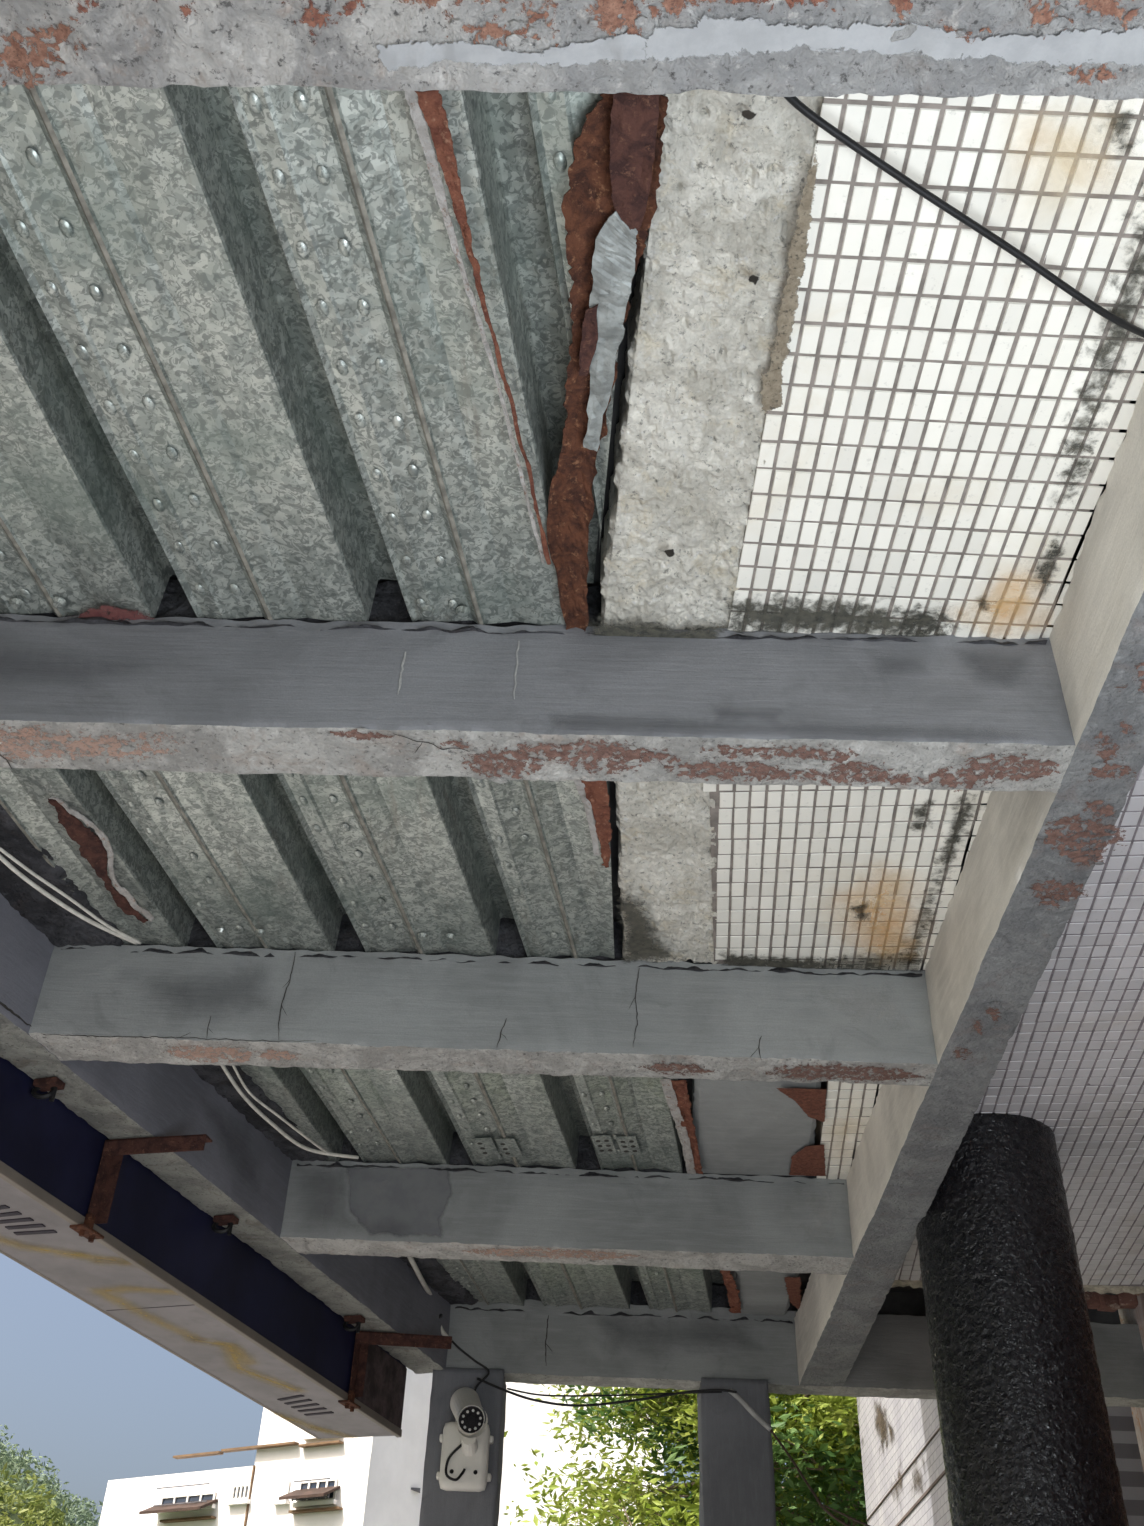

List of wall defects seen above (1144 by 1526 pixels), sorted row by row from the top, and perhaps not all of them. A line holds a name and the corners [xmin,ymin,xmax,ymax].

corrosion [0,0,99,91]
corrosion [270,0,366,46]
corrosion [399,0,560,49]
corrosion [586,0,857,37]
corrosion [405,90,669,632]
damp [1056,228,1144,503]
damp [979,596,1010,611]
damp [1035,540,1064,593]
corrosion [48,797,154,923]
corrosion [438,736,1064,868]
damp [721,795,975,972]
corrosion [1022,799,1127,910]